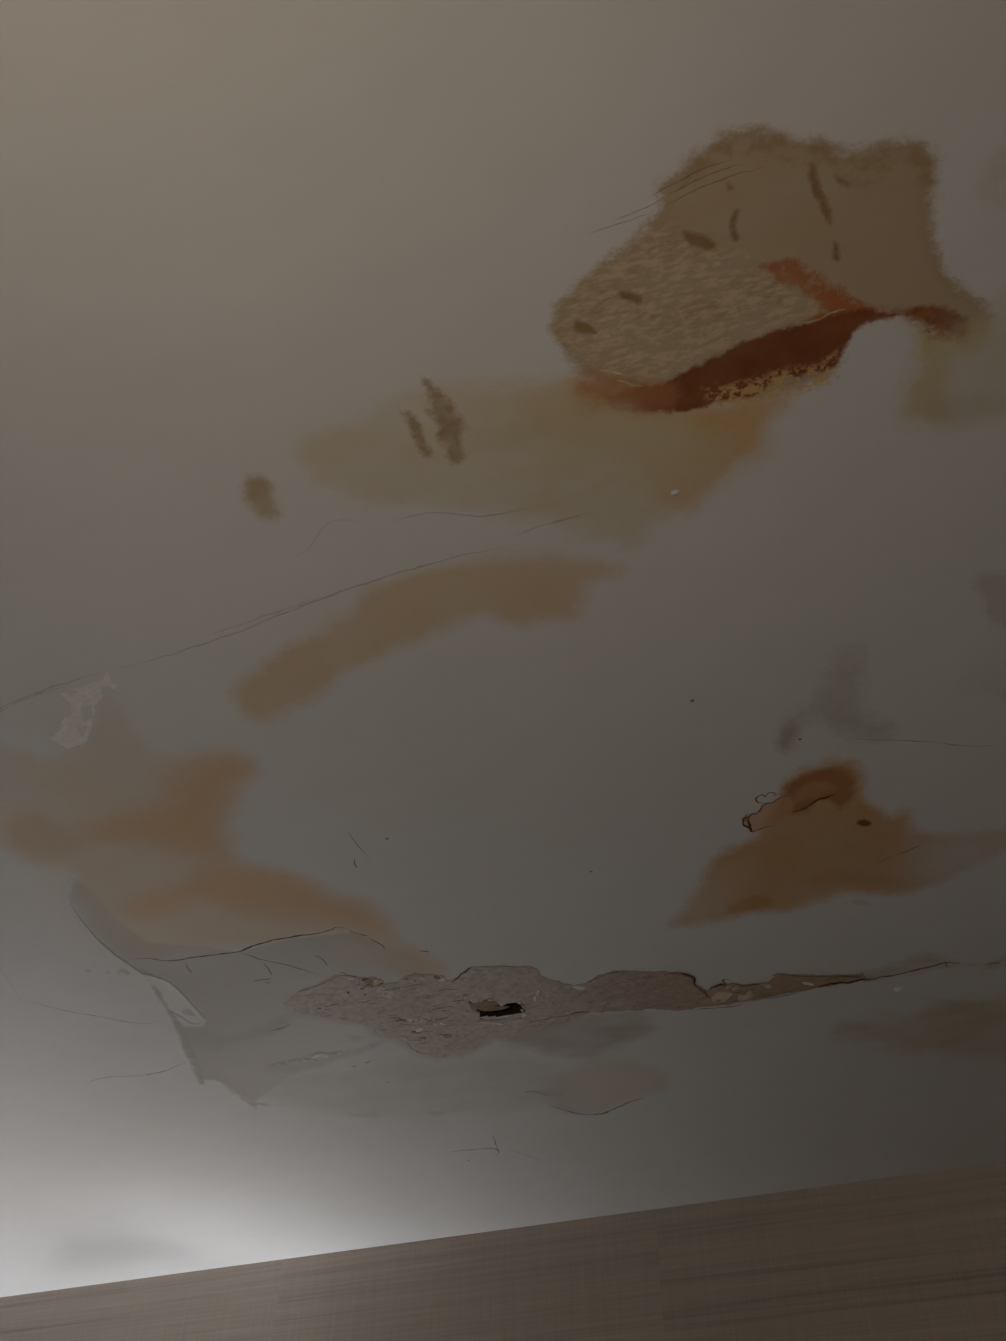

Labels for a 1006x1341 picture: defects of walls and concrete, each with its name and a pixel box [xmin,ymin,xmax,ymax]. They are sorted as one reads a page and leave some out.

damp [0,106,1006,983]
crack [140,927,385,983]
spalling [62,875,877,1087]